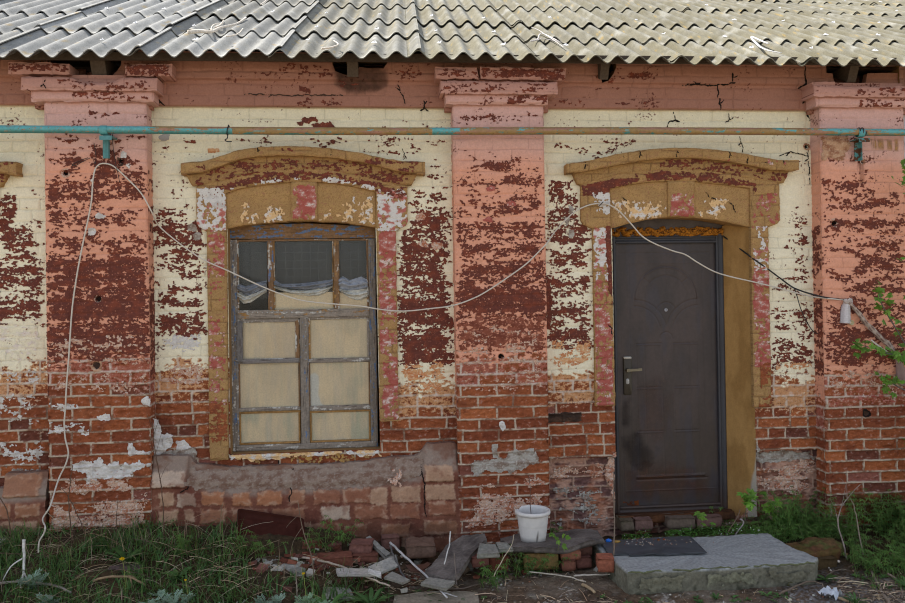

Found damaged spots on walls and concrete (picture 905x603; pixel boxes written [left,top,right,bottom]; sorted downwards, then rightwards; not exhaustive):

peeling [9,62,170,101]
peeling [254,63,359,127]
peeling [438,68,585,125]
peeling [595,68,652,90]
peeling [855,87,905,107]
crack [682,73,810,180]
spalling [756,458,815,496]